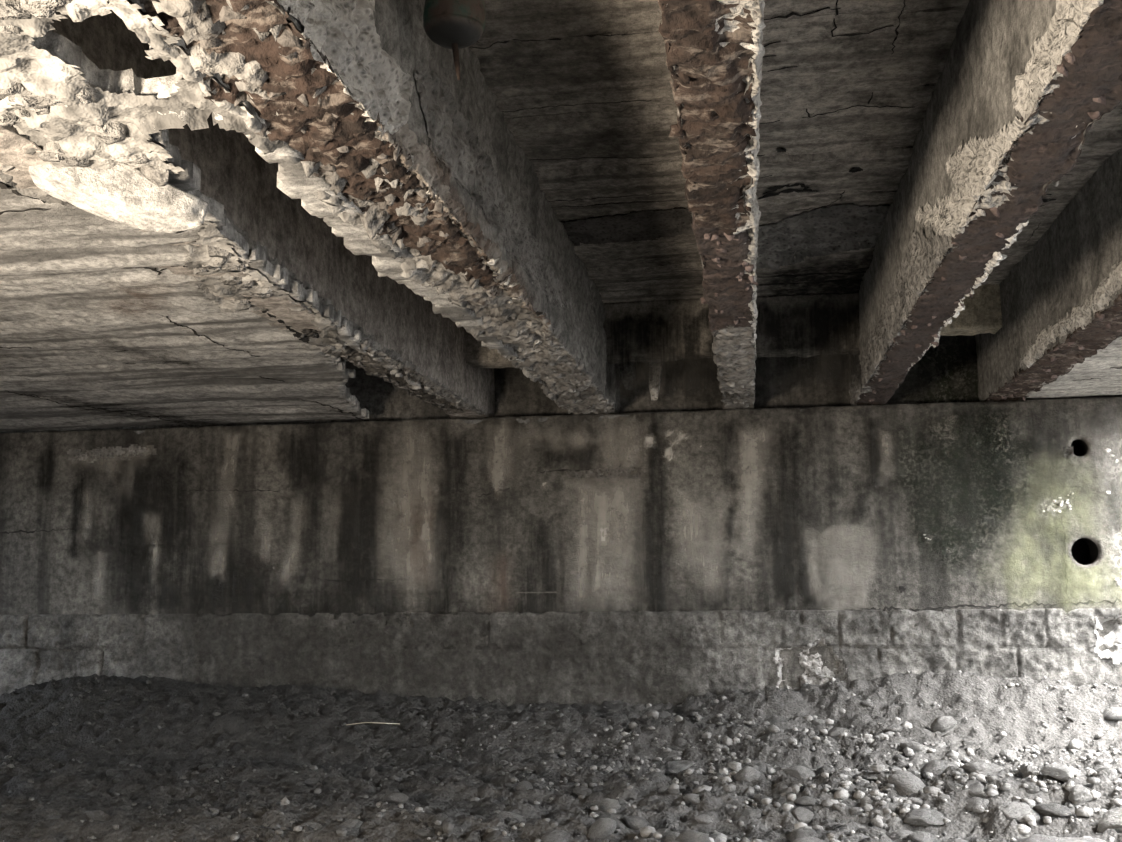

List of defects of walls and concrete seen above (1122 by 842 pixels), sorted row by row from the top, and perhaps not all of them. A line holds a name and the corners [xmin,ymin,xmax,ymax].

crack [763,0,906,72]
crack [0,183,50,215]
spalling [0,0,616,416]
spalling [559,0,891,410]
crack [750,155,845,211]
spalling [849,0,1122,406]
crack [126,266,188,275]
leakage [62,401,217,426]
crack [166,316,367,421]
leakage [70,424,694,706]
leakage [723,426,826,611]
leakage [852,422,889,519]